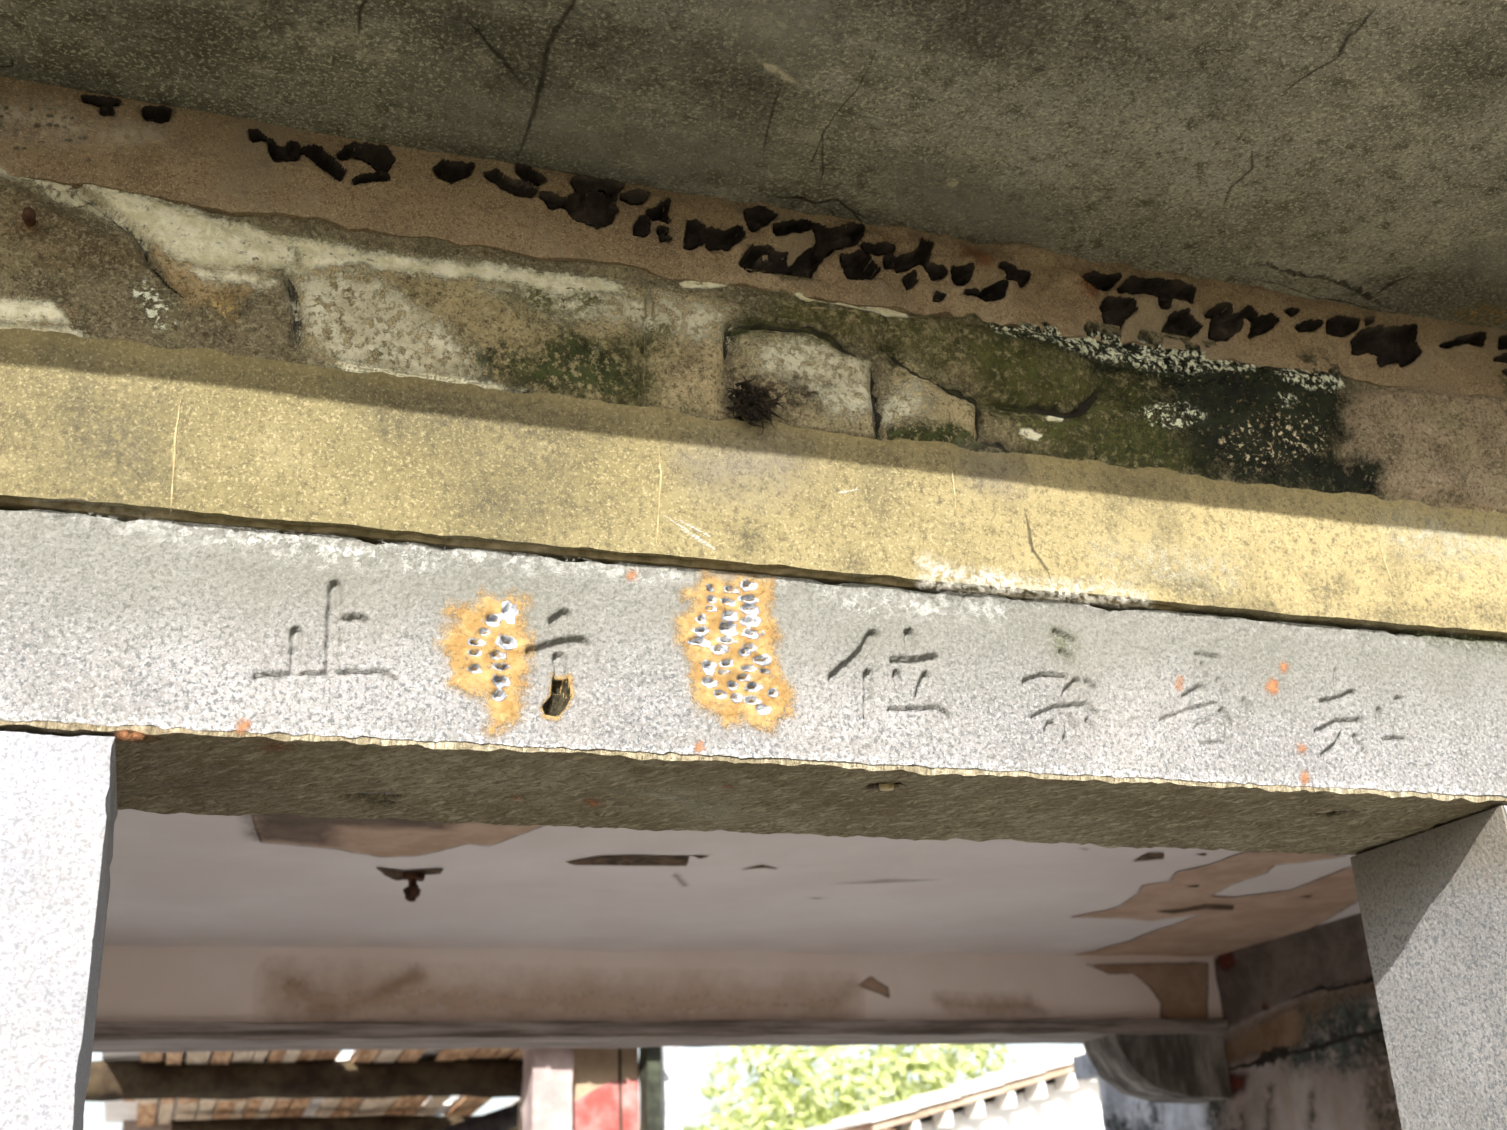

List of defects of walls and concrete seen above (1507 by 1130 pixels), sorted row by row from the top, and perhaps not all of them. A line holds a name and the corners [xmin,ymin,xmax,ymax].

spalling [142,105,172,124]
spalling [248,129,396,185]
crack [471,0,575,155]
damp [0,168,731,400]
spalling [433,159,1031,302]
damp [744,292,1029,425]
spalling [1083,270,1507,376]
damp [1018,415,1063,441]
spalling [540,674,575,720]
flaking render [567,855,707,866]
peeling [1071,851,1376,1065]
damp [1290,991,1401,1130]